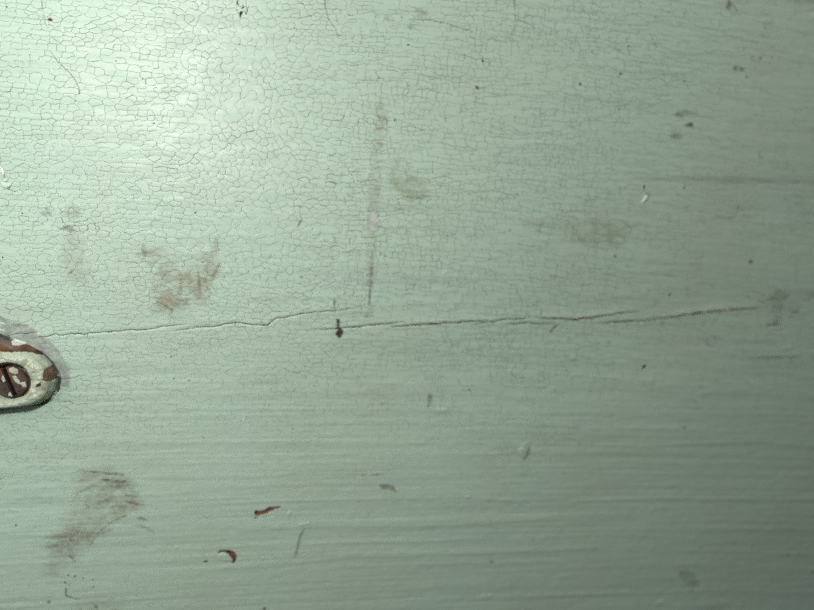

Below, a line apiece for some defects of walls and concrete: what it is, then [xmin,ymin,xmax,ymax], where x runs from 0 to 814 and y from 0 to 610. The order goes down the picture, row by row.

crack [7,307,758,338]